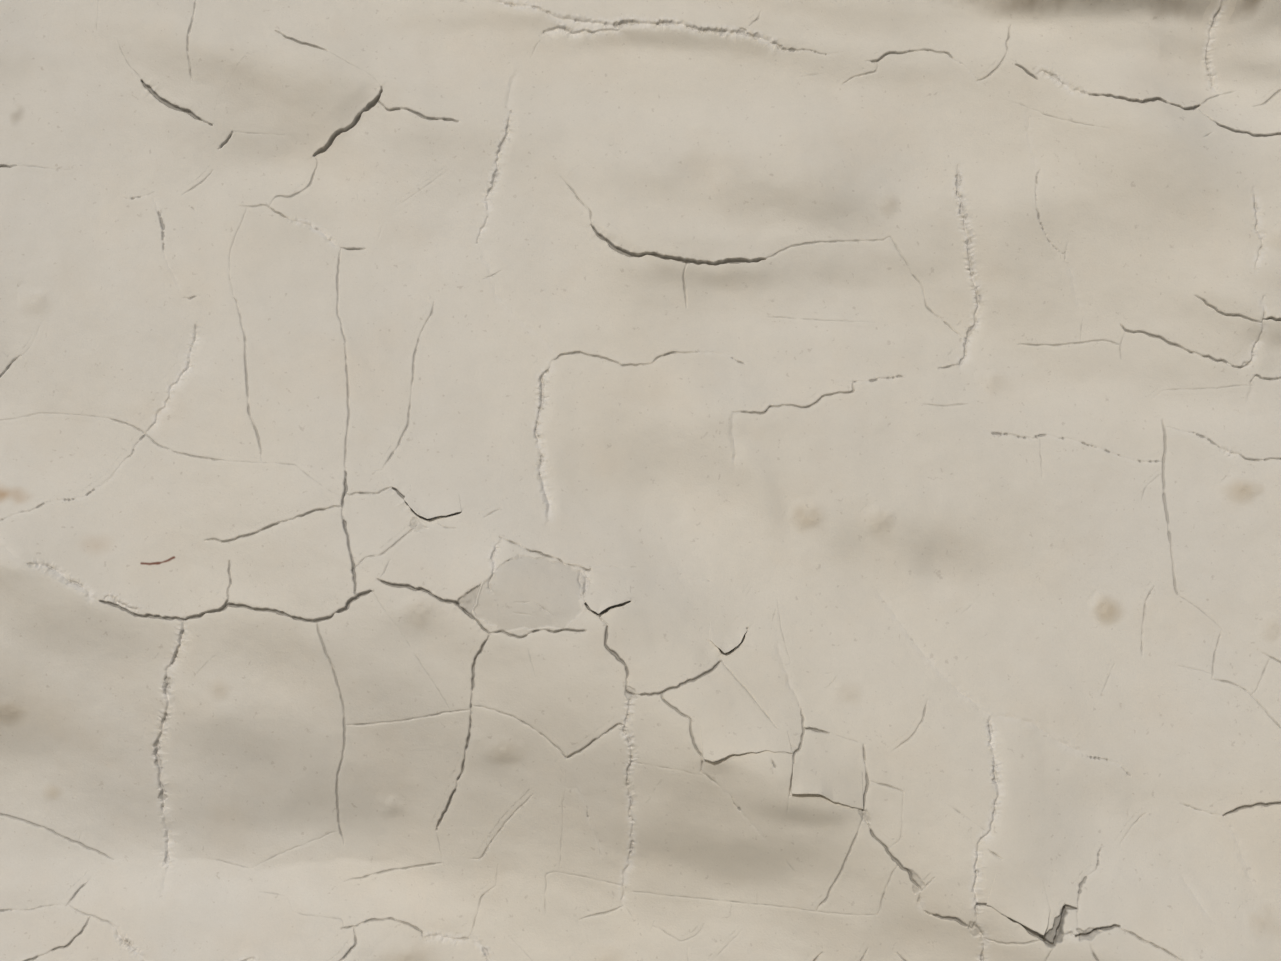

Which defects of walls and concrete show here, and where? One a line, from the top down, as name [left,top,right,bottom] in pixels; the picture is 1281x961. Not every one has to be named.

crack [479,0,1281,144]
crack [0,0,911,926]
crack [555,153,1281,704]
crack [0,809,156,961]
crack [255,887,540,961]
peeling [700,722,874,828]
crack [812,816,1127,961]
peeling [986,871,1107,952]
crack [1173,788,1281,897]